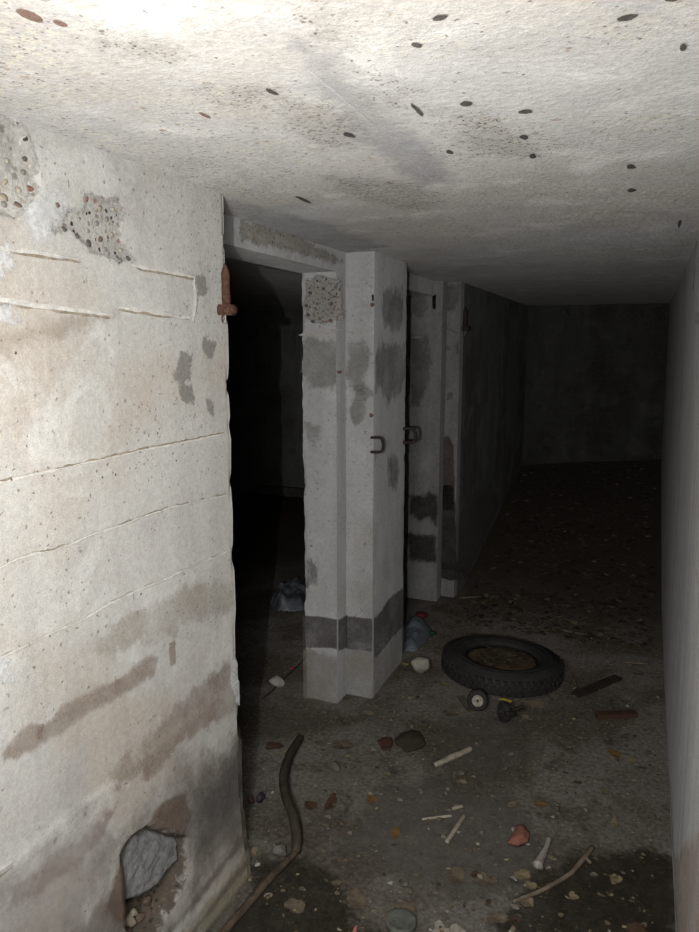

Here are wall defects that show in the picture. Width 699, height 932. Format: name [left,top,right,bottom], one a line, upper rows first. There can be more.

spalling [0,115,42,218]
spalling [51,193,132,264]
crack [0,432,224,484]
crack [0,493,228,569]
spalling [120,826,186,932]